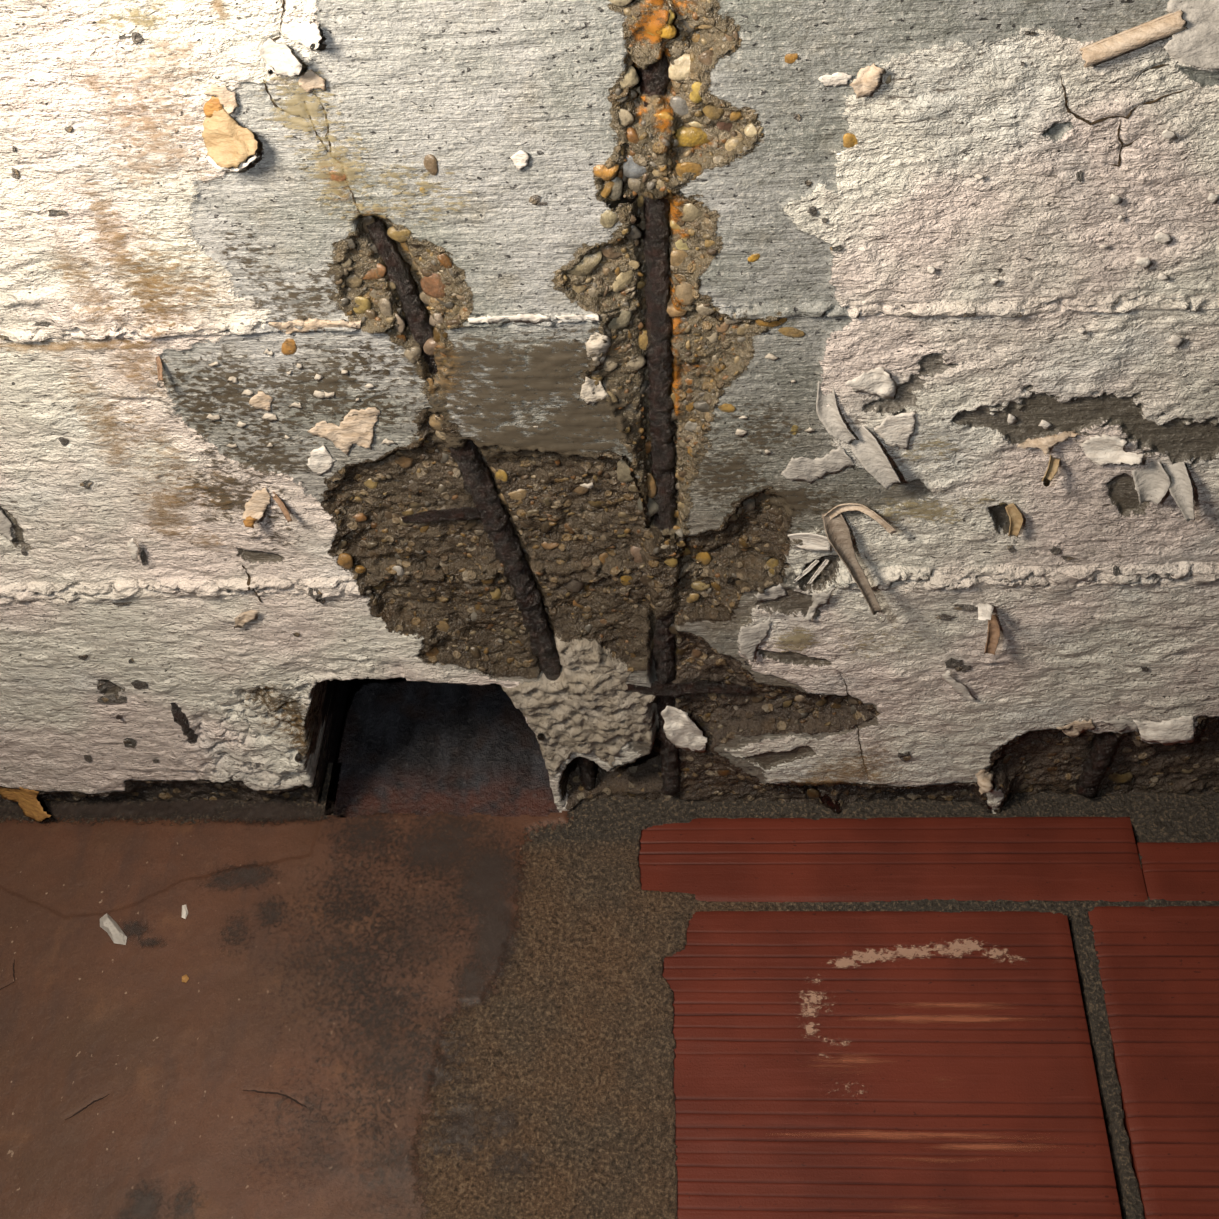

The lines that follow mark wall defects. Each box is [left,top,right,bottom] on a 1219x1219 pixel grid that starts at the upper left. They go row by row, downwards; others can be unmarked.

crack [272,0,285,41]
crack [263,79,361,215]
rust [631,0,690,131]
crack [1061,64,1193,167]
rust [643,195,699,531]
peeling [155,0,1219,814]
rust [617,613,751,795]